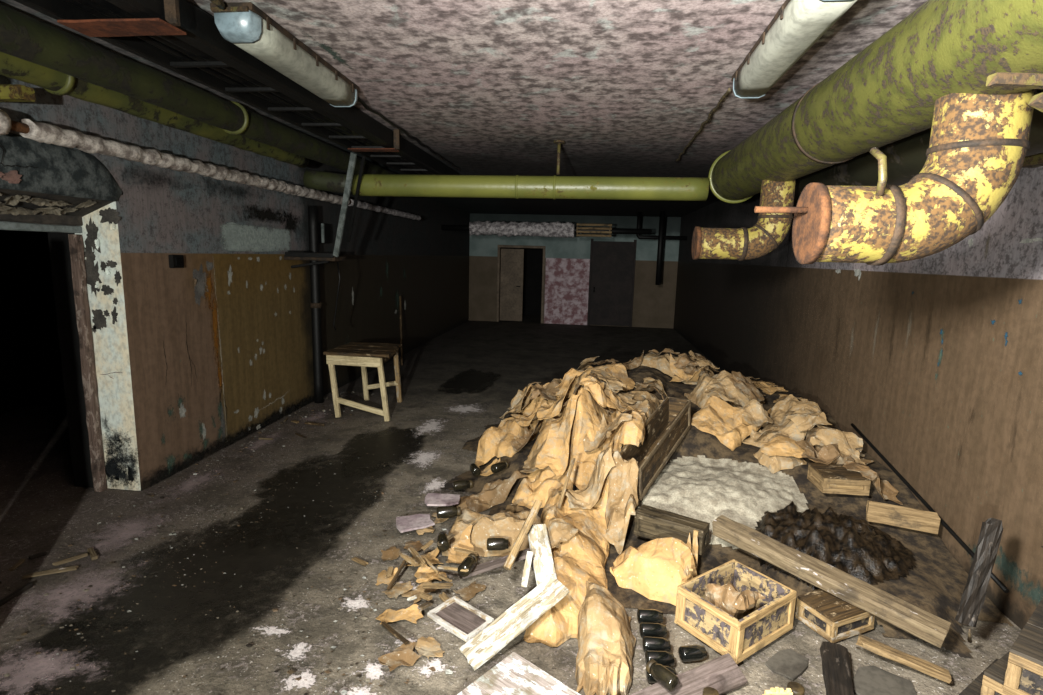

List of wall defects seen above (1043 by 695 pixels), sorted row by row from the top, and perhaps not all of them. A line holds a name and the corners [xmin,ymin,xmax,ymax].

peeling [0,170,122,333]
damp [0,369,500,695]